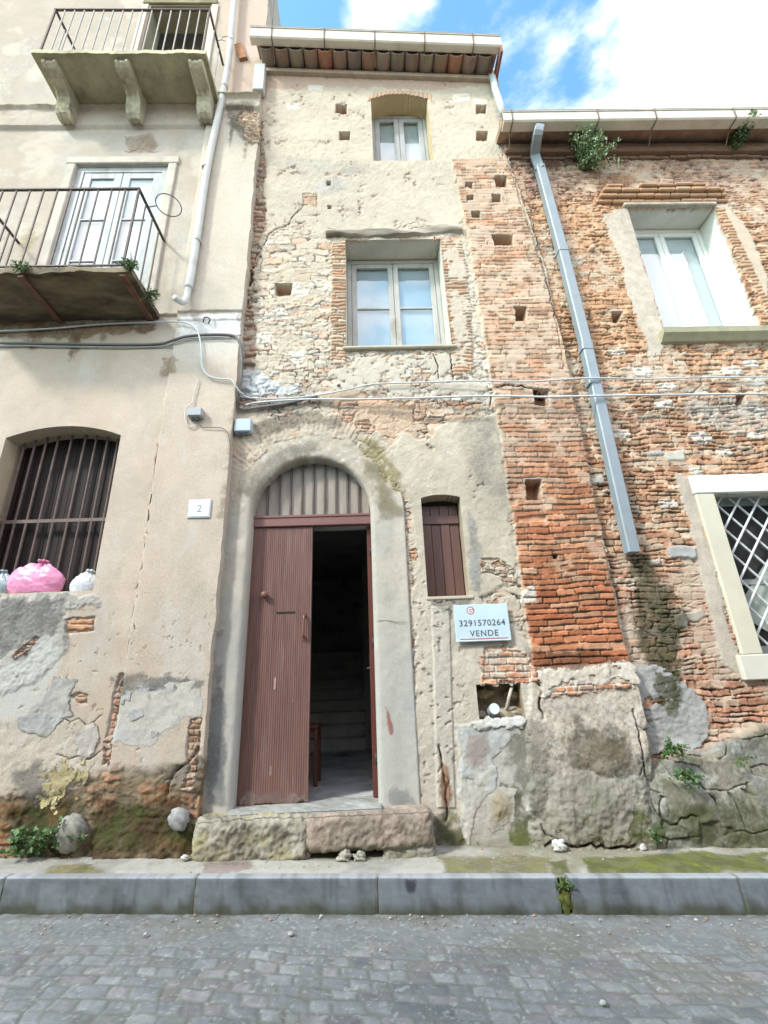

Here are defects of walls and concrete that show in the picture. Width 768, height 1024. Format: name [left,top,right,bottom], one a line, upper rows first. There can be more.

spalling [238,106,261,146]
spalling [11,638,39,660]
flaking render [67,617,94,633]
leakage [629,557,689,673]
peeling [17,676,88,737]
peeling [36,674,203,815]